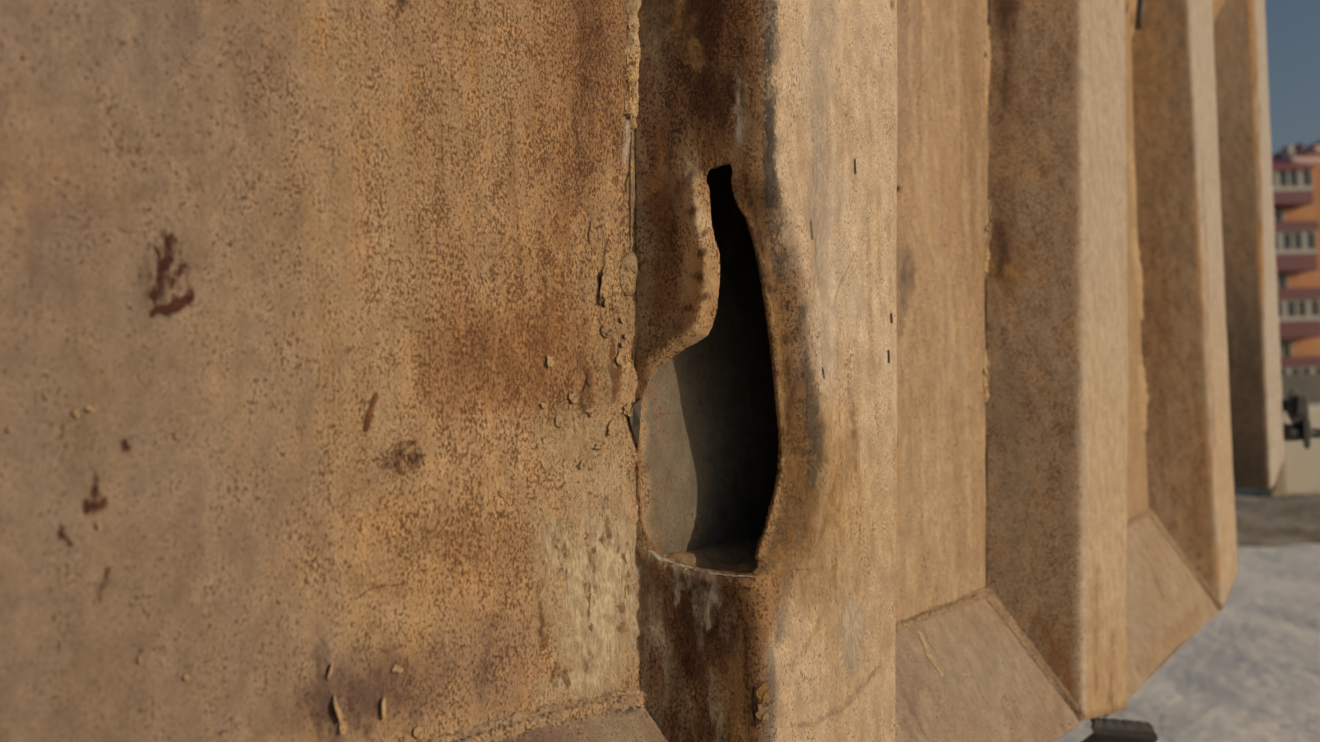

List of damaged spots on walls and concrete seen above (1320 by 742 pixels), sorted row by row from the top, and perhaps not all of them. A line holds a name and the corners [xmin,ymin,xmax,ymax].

corrosion [762,6,784,280]
corrosion [148,231,195,317]
corrosion [83,474,107,514]
corrosion [672,562,743,742]